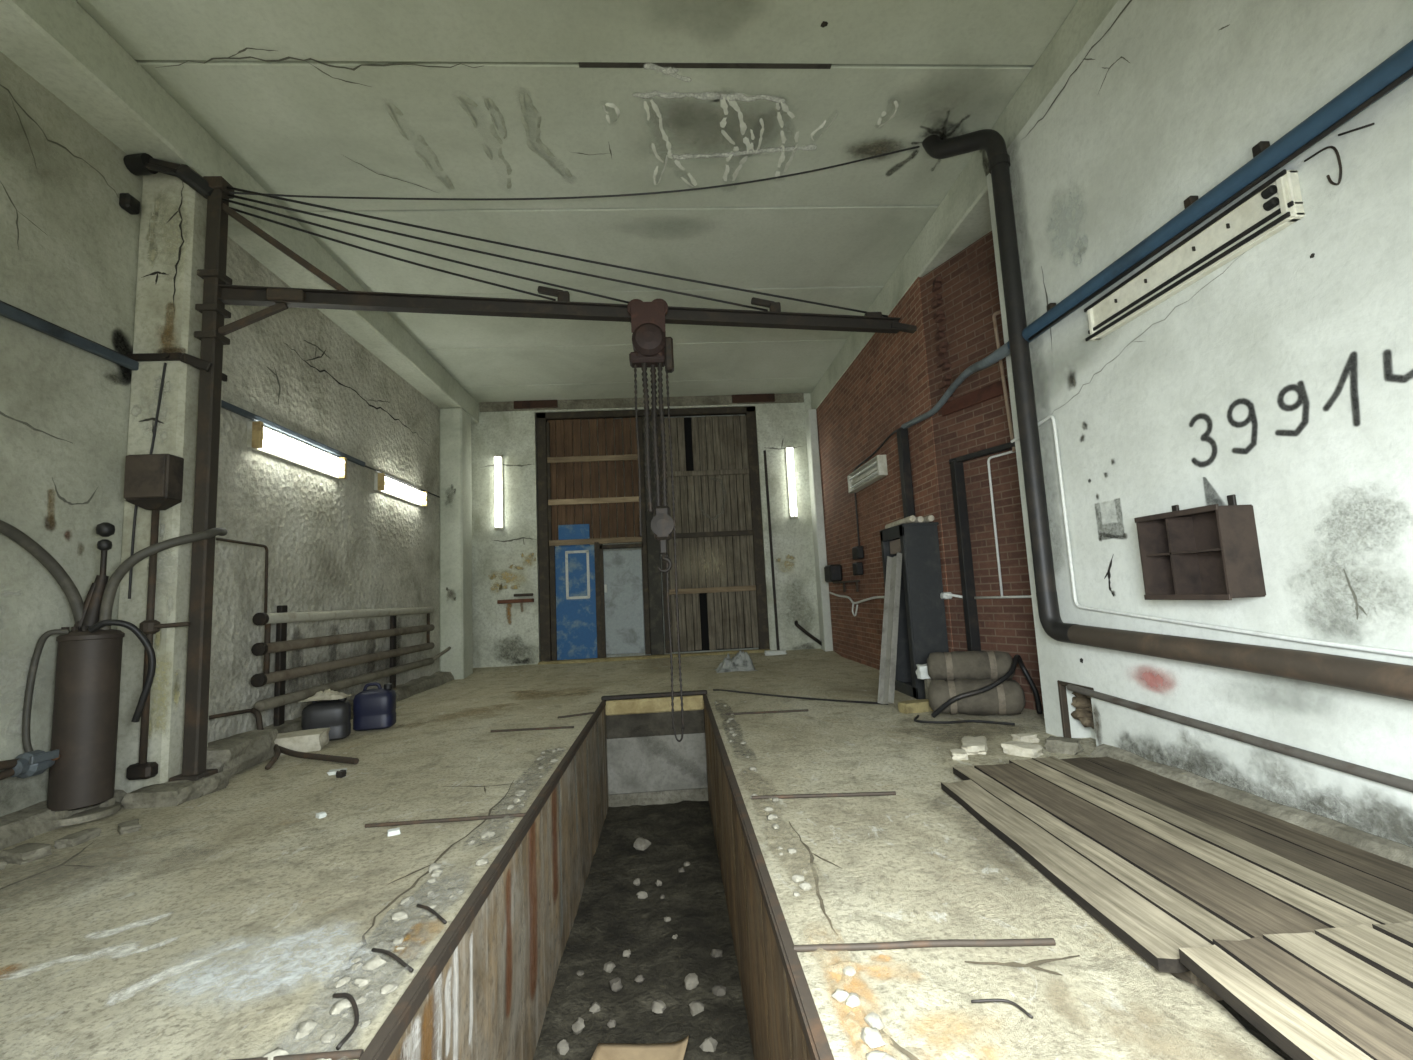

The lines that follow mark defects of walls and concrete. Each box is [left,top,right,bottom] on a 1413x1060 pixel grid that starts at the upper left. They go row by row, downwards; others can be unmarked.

crack [155,47,482,87]
crack [0,85,119,198]
peeling [456,94,572,189]
peeling [643,100,697,187]
peeling [720,94,838,181]
leakage [856,113,966,176]
rust [158,303,185,353]
crack [267,340,429,446]
leakage [1119,735,1413,848]
crack [344,780,516,977]
crack [789,822,841,936]
crack [851,991,919,1060]